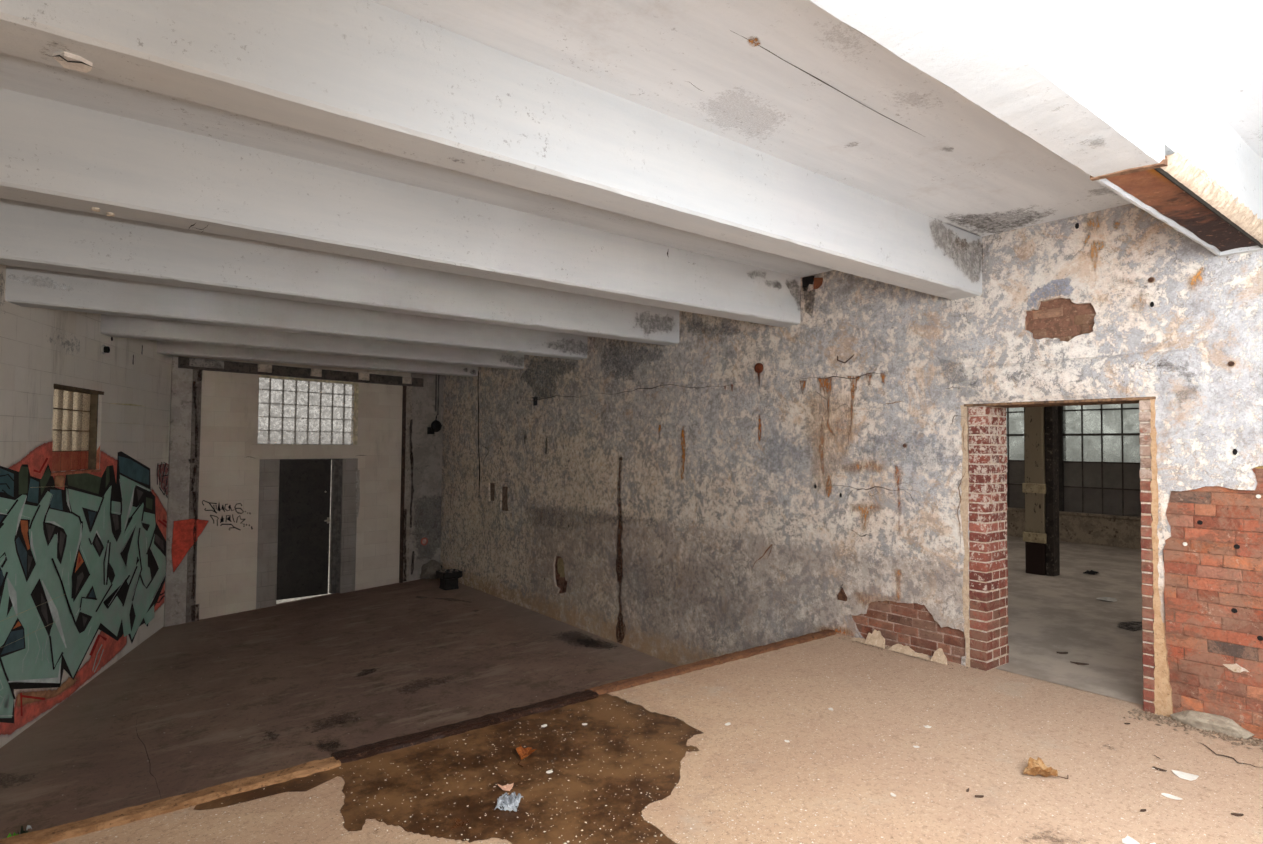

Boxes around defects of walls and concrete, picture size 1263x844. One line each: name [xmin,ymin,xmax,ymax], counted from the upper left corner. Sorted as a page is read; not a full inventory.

crack [730,30,925,137]
spalling [1090,152,1263,252]
flaking render [1025,278,1096,342]
corrosion [800,378,835,497]
corrosion [847,373,885,431]
corrosion [616,457,625,643]
flaking render [851,405,971,667]
flaking render [1150,399,1263,740]
water stain [194,693,703,844]